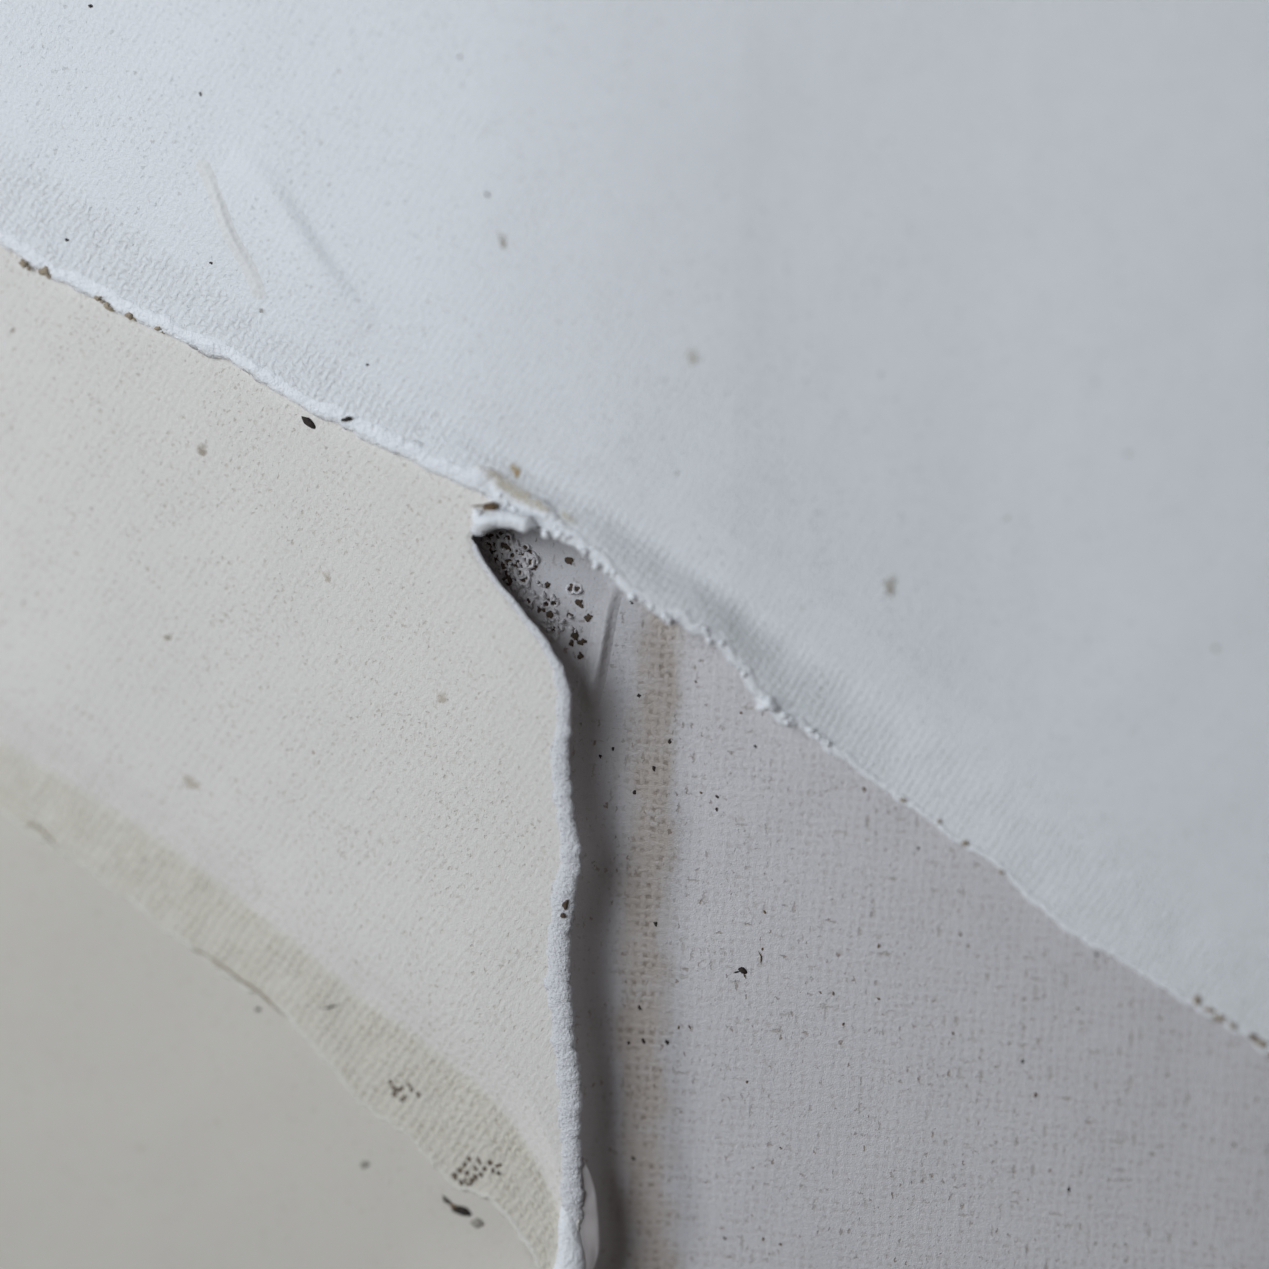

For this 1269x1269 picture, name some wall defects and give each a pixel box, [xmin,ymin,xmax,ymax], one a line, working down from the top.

spalling [471,508,593,659]
peeling [388,1079,421,1102]
peeling [451,1156,502,1186]
peeling [442,1195,472,1216]